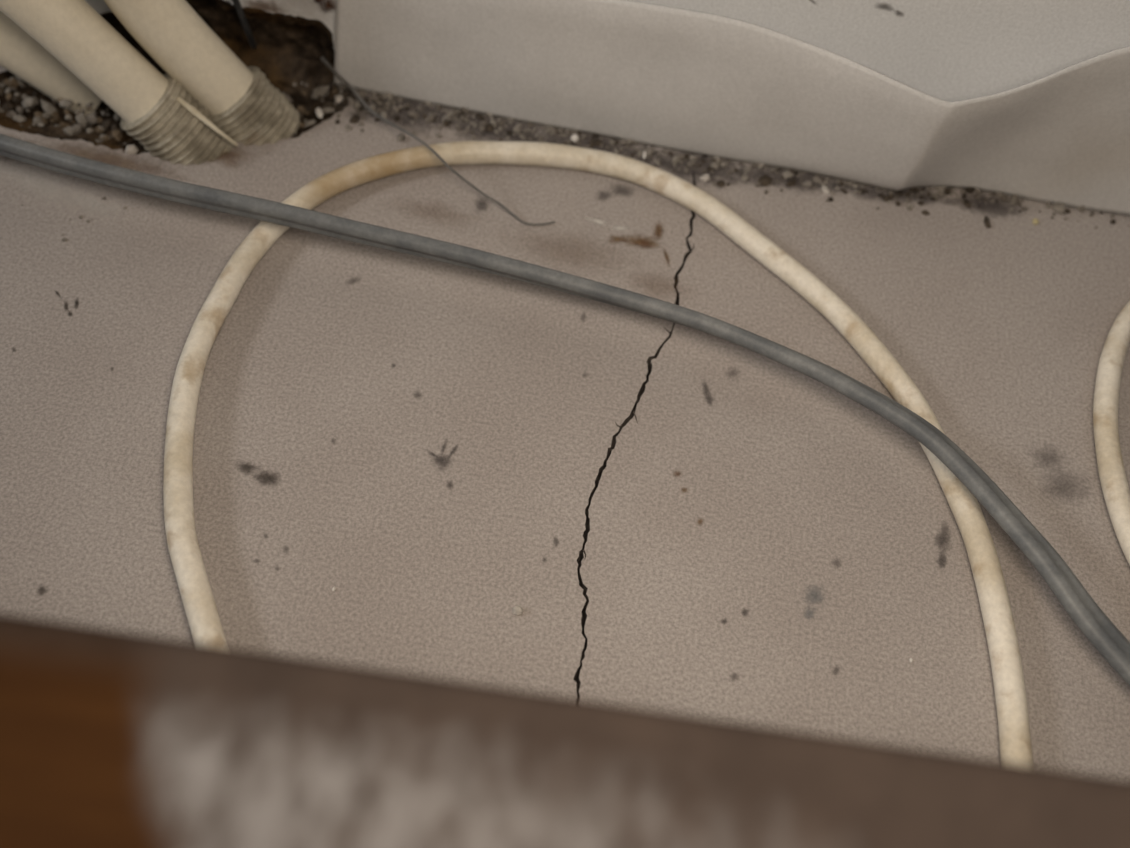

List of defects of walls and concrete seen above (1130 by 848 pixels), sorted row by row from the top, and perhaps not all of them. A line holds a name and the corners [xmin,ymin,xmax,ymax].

spalling [0,71,149,155]
spalling [100,12,167,75]
spalling [186,0,355,138]
crack [574,176,697,700]